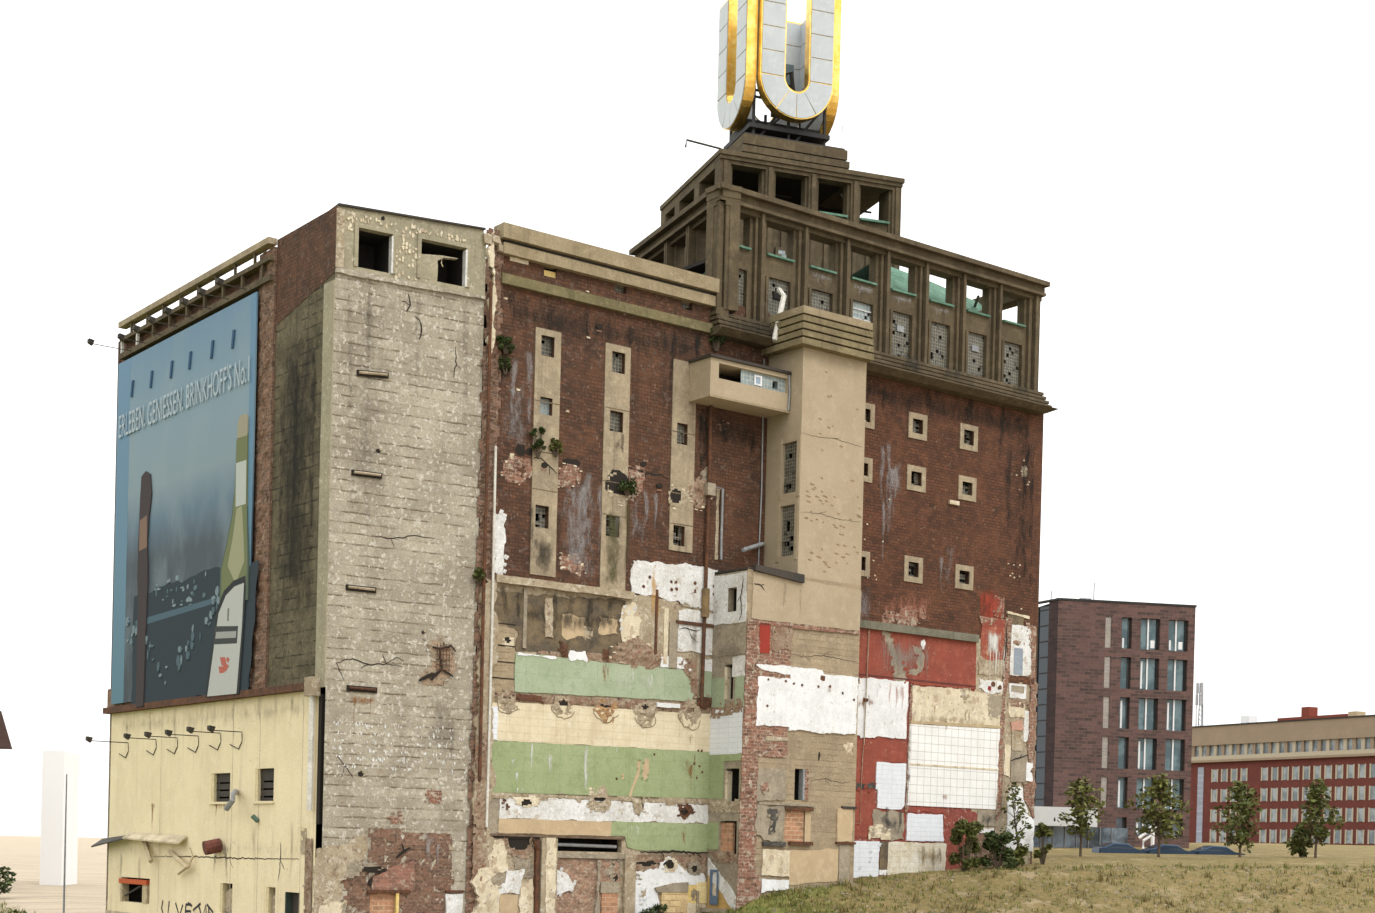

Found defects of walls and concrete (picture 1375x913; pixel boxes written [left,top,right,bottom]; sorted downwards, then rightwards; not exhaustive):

spalling [500,443,582,491]
crack [336,645,456,682]
peeling [882,605,926,683]
spalling [332,721,740,889]
flaking render [300,811,454,913]
flaking render [556,851,738,913]